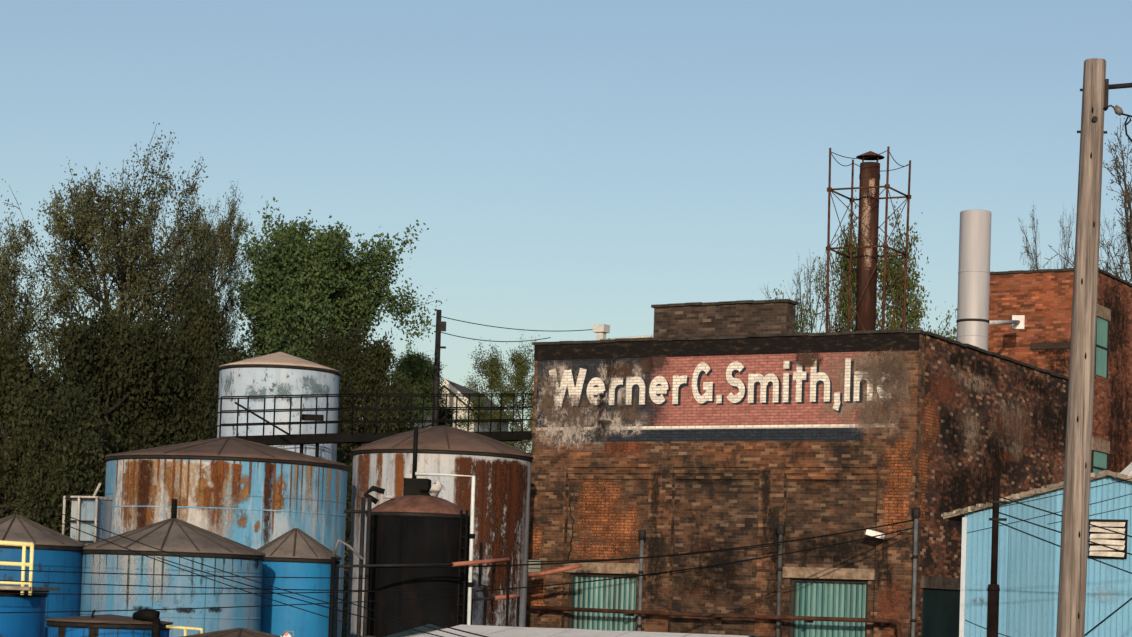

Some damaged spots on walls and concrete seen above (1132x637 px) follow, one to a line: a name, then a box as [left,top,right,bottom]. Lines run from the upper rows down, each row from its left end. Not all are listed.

peeling [224,375,329,401]
peeling [540,376,603,426]
peeling [617,401,638,423]
peeling [608,355,668,378]
peeling [793,352,822,367]
corrosion [116,459,340,542]
corrosion [356,453,405,522]
corrosion [454,457,528,627]